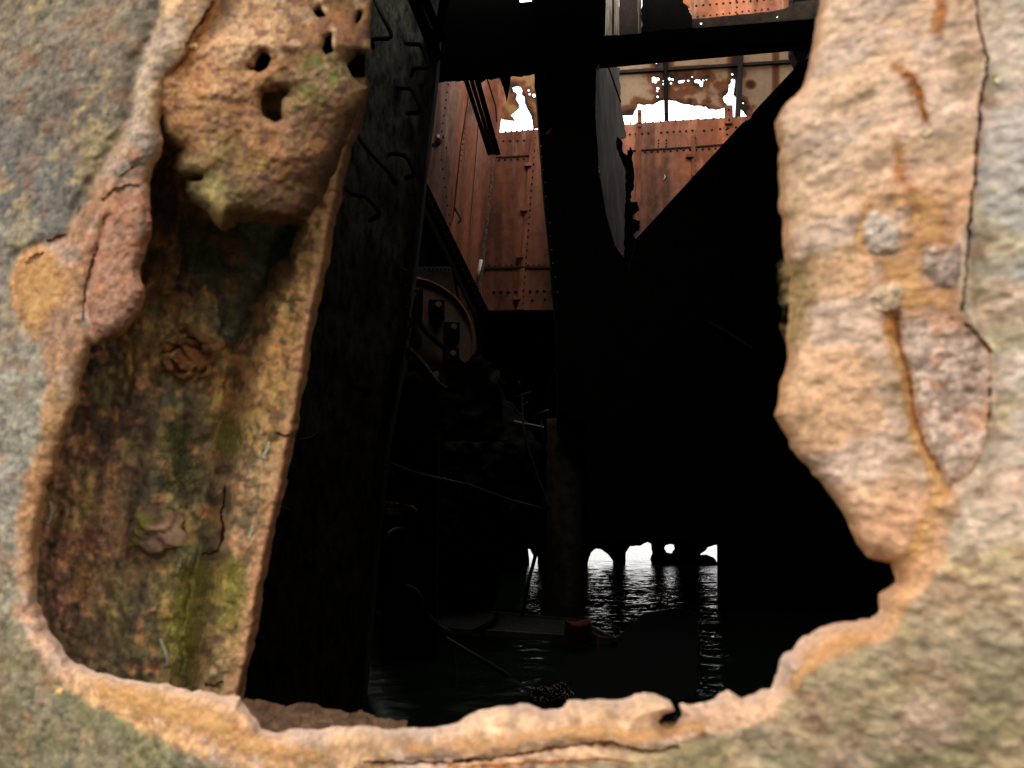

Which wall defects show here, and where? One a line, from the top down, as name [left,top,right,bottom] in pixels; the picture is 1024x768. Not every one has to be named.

crack [24,234,66,264]
crack [82,158,147,320]
peeling [87,192,152,339]
peeling [112,132,160,177]
corrosion [159,0,372,232]
peeling [616,137,640,267]
peeling [863,210,901,254]
corrosion [892,64,926,119]
crack [950,0,992,437]
peeling [163,323,201,381]
corrosion [876,144,953,573]